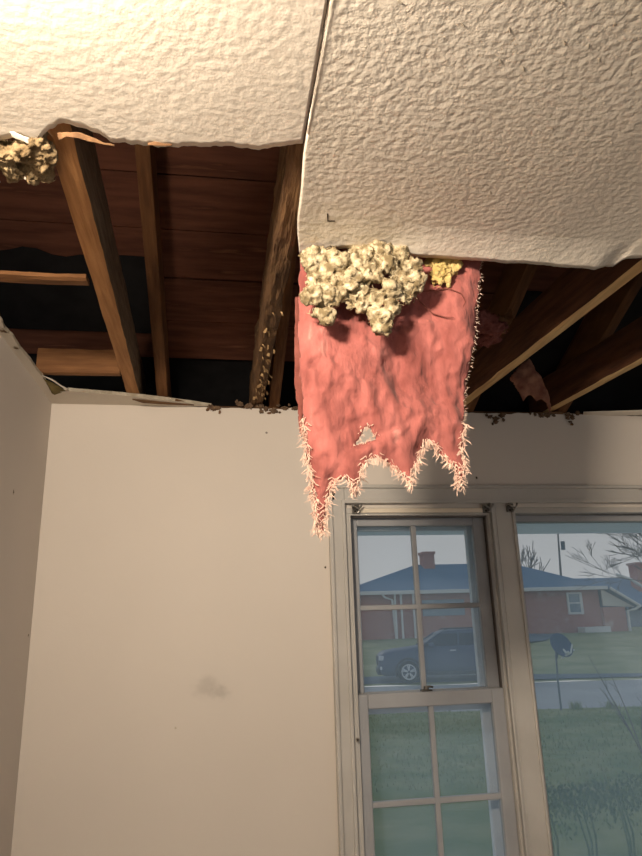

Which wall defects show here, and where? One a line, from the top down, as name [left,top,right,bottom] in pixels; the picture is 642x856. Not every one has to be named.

crack [303,0,333,143]
spalling [235,328,298,414]